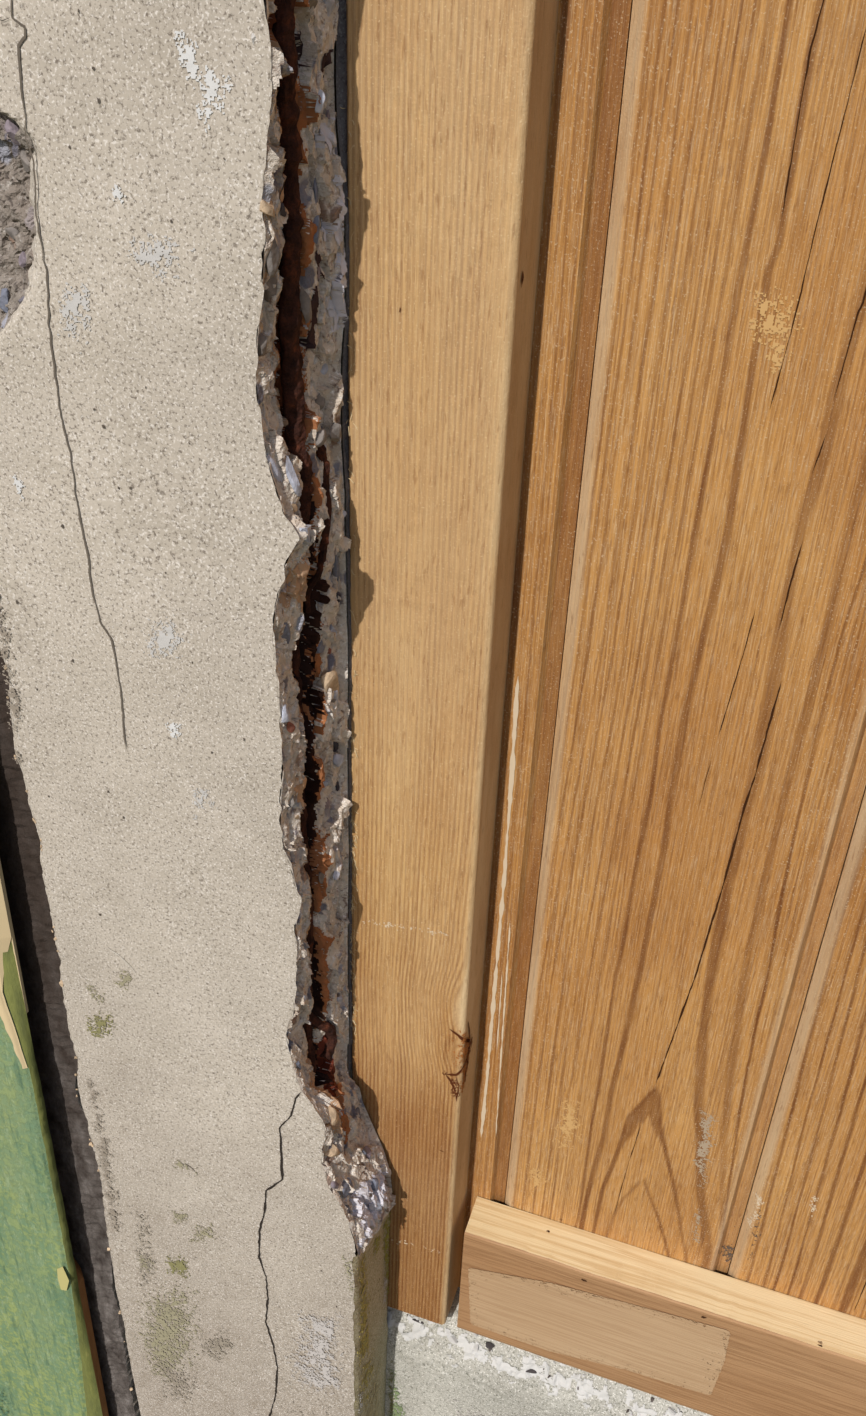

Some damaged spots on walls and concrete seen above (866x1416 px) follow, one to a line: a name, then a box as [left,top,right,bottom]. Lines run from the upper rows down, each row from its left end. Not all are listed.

spalling [0,112,37,331]
crack [1,0,126,746]
corrosion [268,0,321,456]
peeling [0,861,29,1069]
corrosion [279,473,351,1156]
spalling [251,0,396,1257]
crack [258,1092,301,1416]